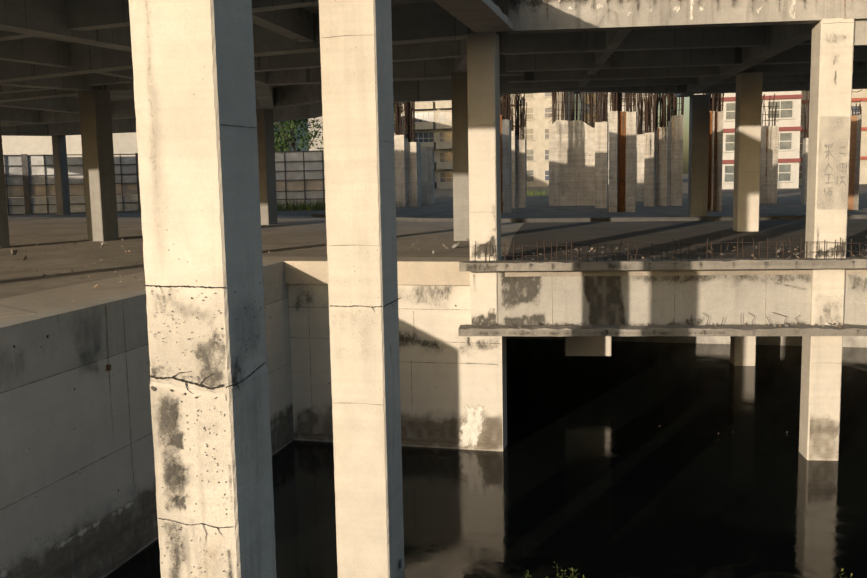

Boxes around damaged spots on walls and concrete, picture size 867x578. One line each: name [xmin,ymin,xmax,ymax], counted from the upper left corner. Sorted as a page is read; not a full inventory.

leakage [509,0,621,17]
rust [618,112,626,211]
leakage [467,236,570,350]
leakage [583,263,626,334]
leakage [390,332,439,348]
crack [149,362,266,394]
leakage [270,405,333,454]
leakage [401,415,502,450]
leakage [0,394,231,578]